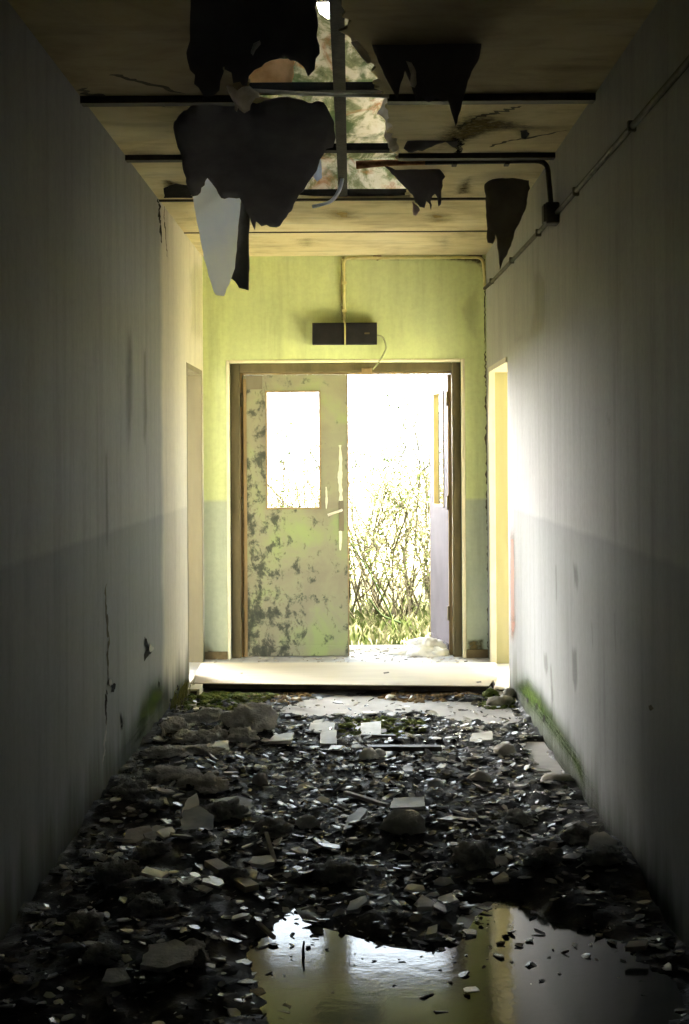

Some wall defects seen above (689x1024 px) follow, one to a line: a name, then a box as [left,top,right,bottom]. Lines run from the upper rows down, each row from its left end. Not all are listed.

crack [453,106,521,154]
crack [490,130,566,147]
spalling [163,180,192,198]
spalling [144,638,154,661]
crack [102,584,110,765]